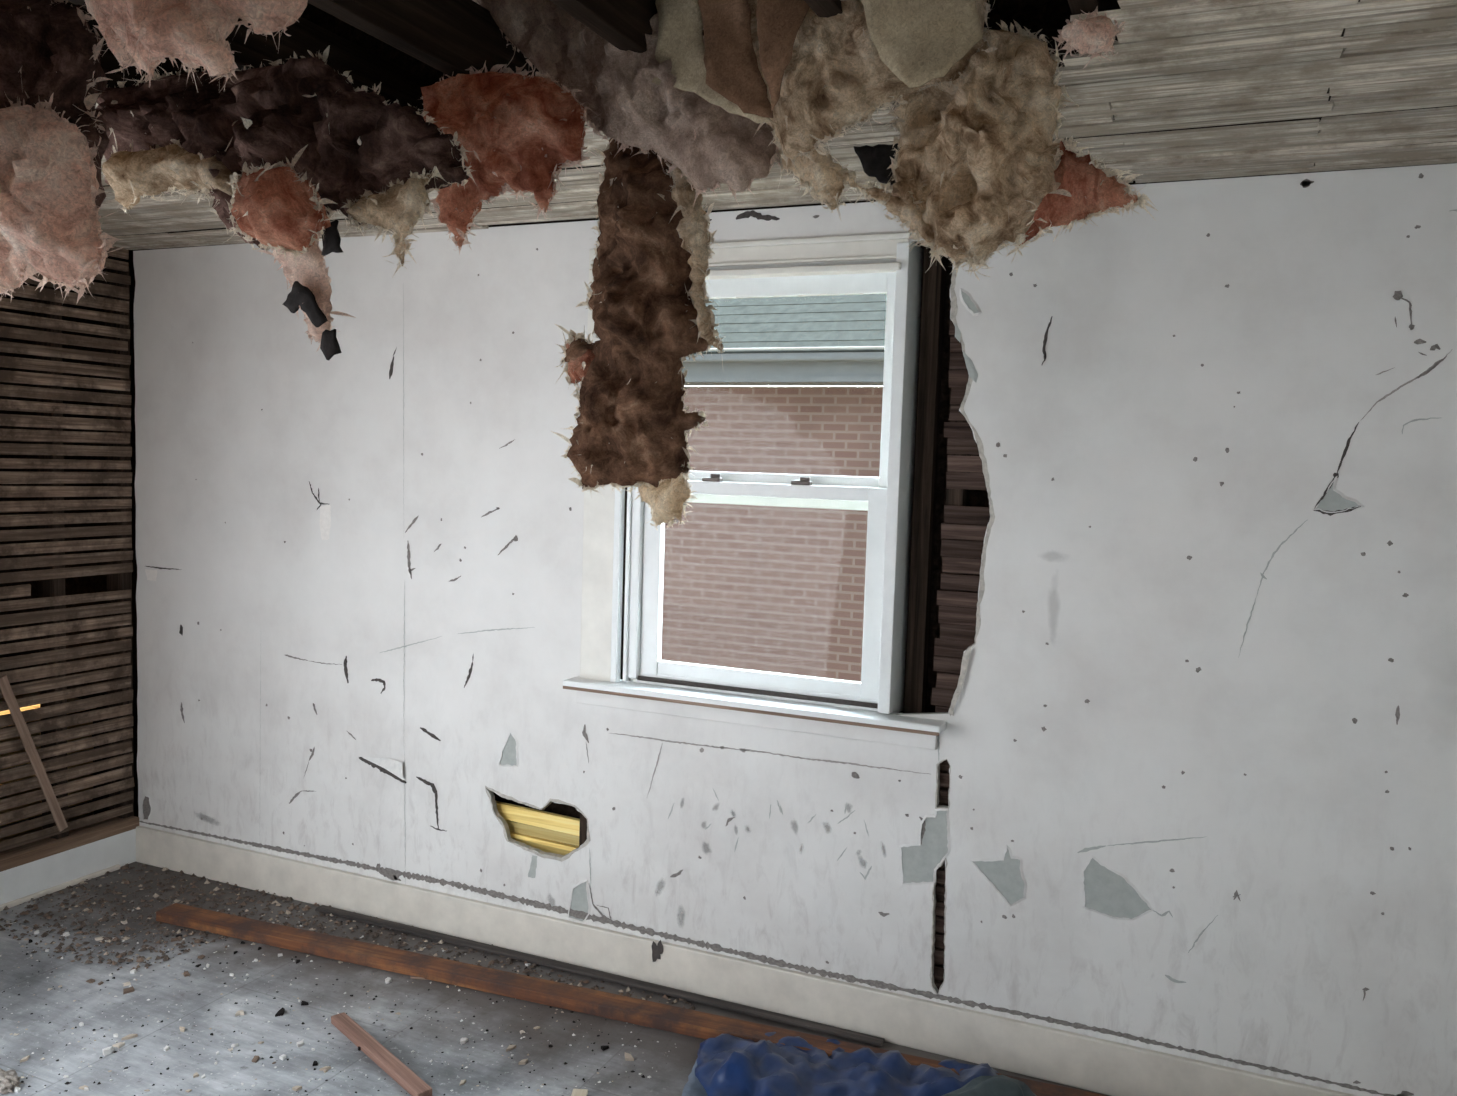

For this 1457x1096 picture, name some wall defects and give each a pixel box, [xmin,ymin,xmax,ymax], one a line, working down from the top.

crack [1361,291,1452,420]
flaking render [948,270,1007,717]
crack [1238,520,1307,658]
peeling [499,731,519,767]
peeling [528,855,537,878]
peeling [899,808,951,885]
peeling [970,840,1027,919]
peeling [1081,855,1154,921]